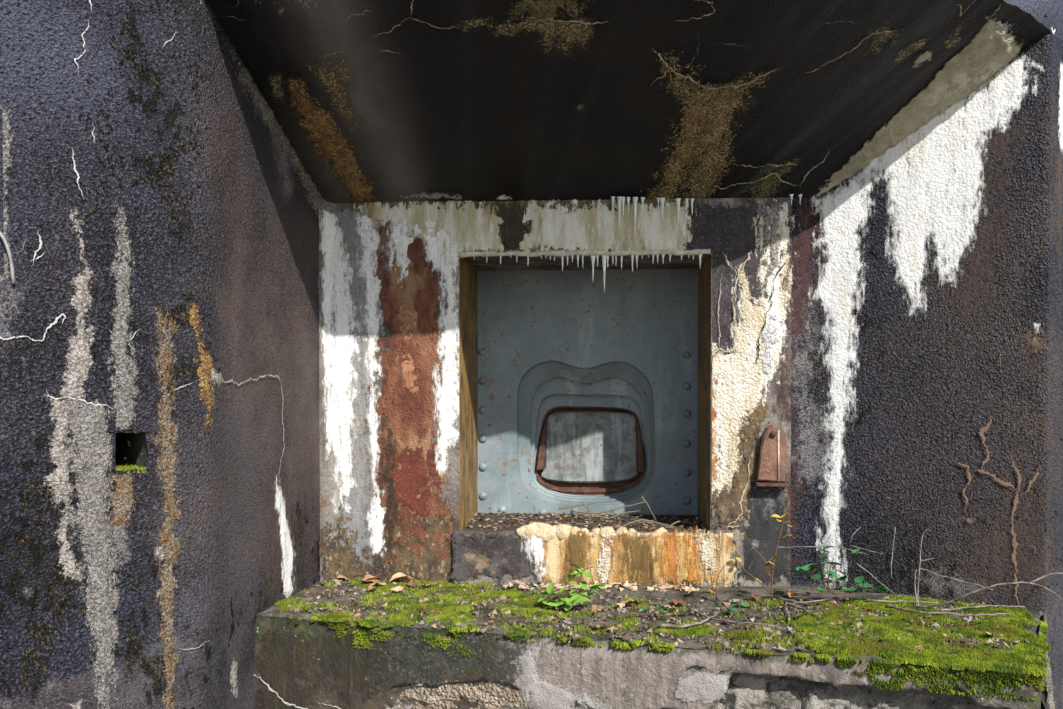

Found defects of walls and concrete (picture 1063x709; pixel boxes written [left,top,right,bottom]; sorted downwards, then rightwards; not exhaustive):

crack [312,0,460,57]
crack [0,313,66,341]
water stain [43,204,141,709]
water stain [151,306,182,709]
spalling [385,640,612,709]
rust [363,221,737,587]
water stain [230,49,1044,599]
spalling [675,668,1006,709]